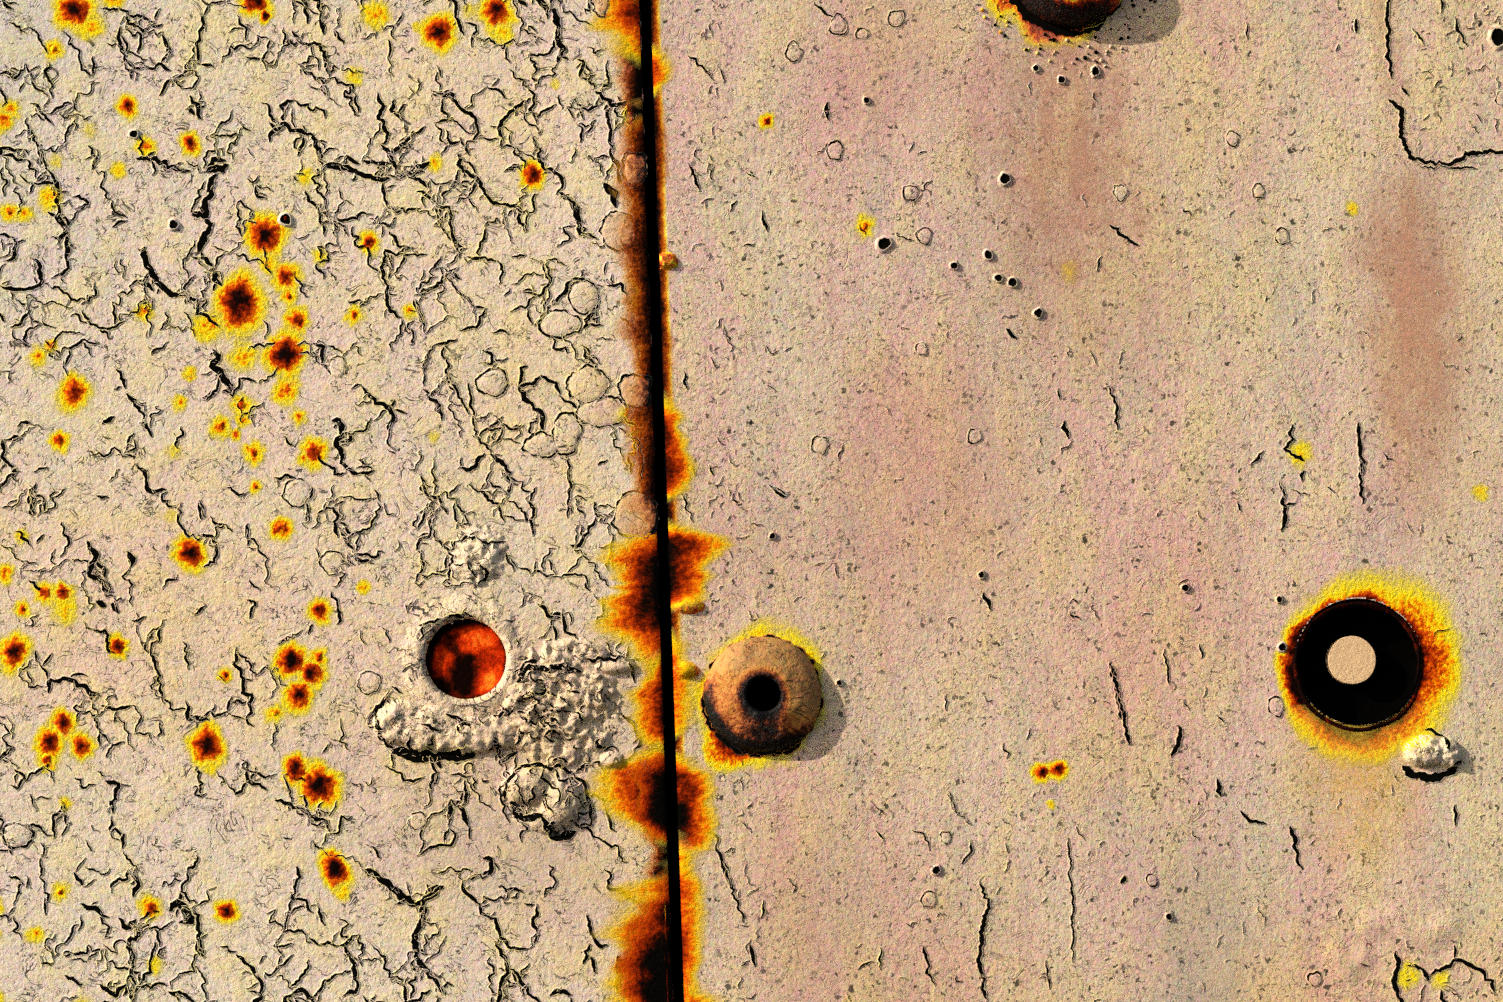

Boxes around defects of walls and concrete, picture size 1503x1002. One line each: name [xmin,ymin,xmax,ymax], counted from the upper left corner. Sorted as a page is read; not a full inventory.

crack [951,0,1124,102]
rust [985,0,1094,48]
crack [1323,0,1503,172]
rust [193,211,329,494]
rust [591,0,826,1002]
crack [681,0,873,1002]
crack [1156,387,1423,586]
rust [425,619,506,699]
rust [1029,759,1070,809]
crack [843,578,1315,1002]
rust [1273,571,1462,784]
crack [1391,727,1485,826]